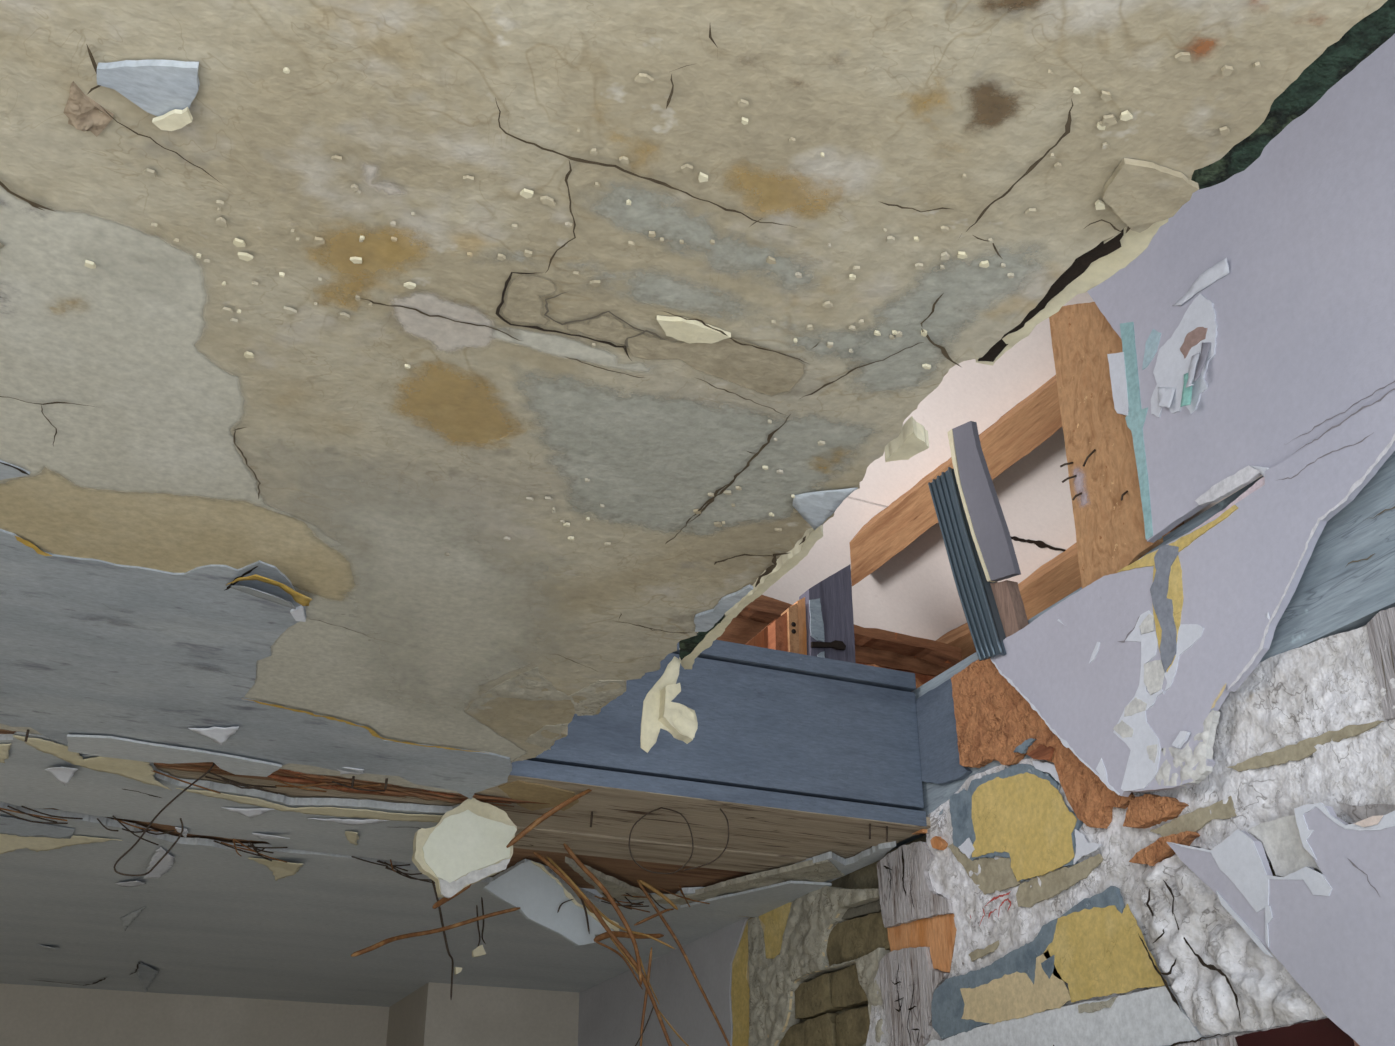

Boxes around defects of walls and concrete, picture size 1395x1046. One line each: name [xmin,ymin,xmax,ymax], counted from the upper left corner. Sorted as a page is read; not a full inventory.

leakage [983,0,1040,10]
peeling [63,60,200,137]
crack [495,98,797,272]
crack [878,98,1073,258]
leakage [968,83,1018,128]
leakage [315,232,425,305]
crack [355,297,520,341]
peeling [0,186,526,761]
leakage [519,374,871,535]
crack [664,294,961,544]
flaking render [731,886,891,1046]
peeling [931,761,1167,1039]